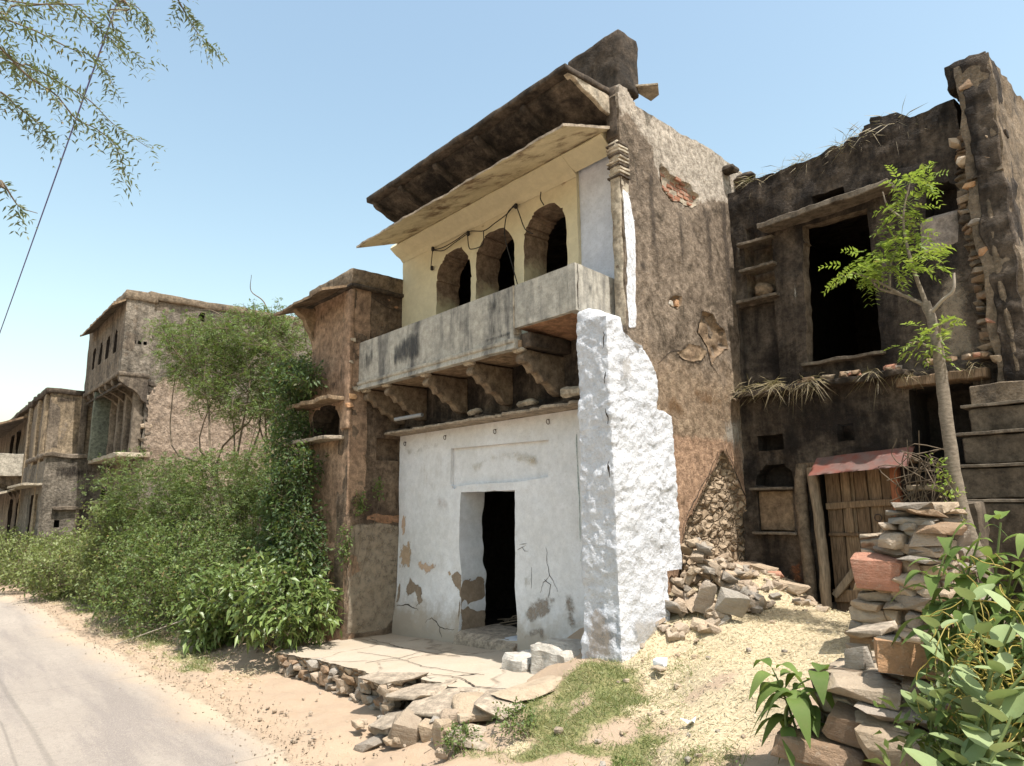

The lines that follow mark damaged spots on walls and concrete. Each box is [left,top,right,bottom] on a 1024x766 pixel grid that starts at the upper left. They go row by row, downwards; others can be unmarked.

spalling [659,164,700,208]
spalling [668,295,682,309]
water stain [394,335,418,363]
spalling [660,310,728,374]
spalling [679,450,747,578]
peeling [347,513,436,633]
spalling [448,571,486,630]
crack [361,603,507,689]